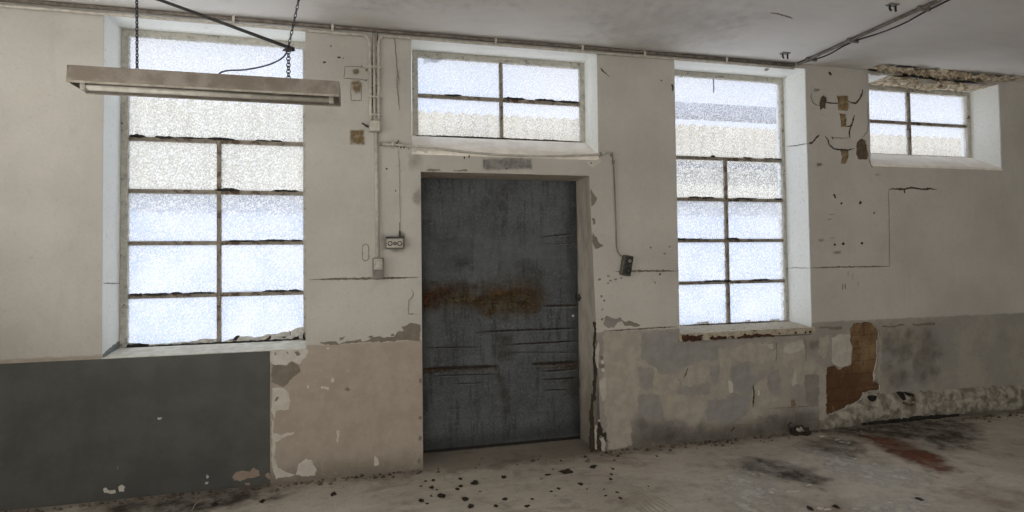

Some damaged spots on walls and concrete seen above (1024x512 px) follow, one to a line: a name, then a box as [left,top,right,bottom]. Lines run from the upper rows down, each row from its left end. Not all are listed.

flaking render [867,64,1024,92]
flaking render [819,95,849,127]
flaking render [840,139,868,164]
crack [792,186,936,268]
corrosion [422,279,543,316]
peeling [320,323,421,349]
corrosion [682,333,781,342]
peeling [589,275,720,452]
flaking render [792,322,935,420]
peeling [232,349,317,485]